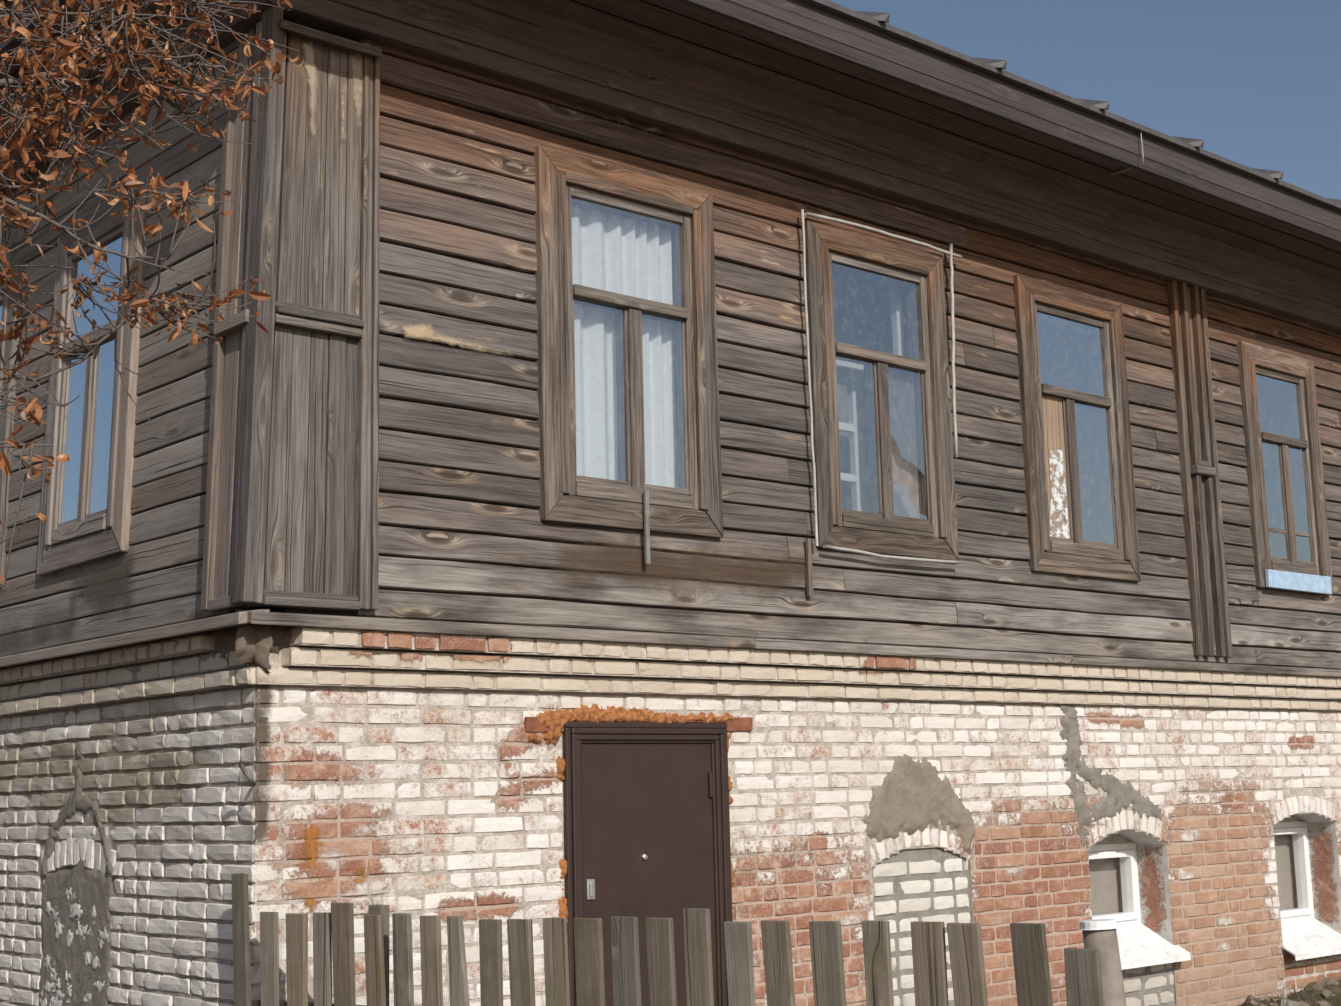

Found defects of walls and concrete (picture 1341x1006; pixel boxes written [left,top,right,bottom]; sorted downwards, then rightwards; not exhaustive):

peeling [40,887,110,1006]
crack [42,738,117,881]
peeling [271,749,400,922]
peeling [435,890,523,922]
peeling [490,703,560,811]
peeling [731,812,874,1006]
peeling [955,788,1109,1006]
crack [1056,704,1162,848]
peeling [1136,760,1285,1006]